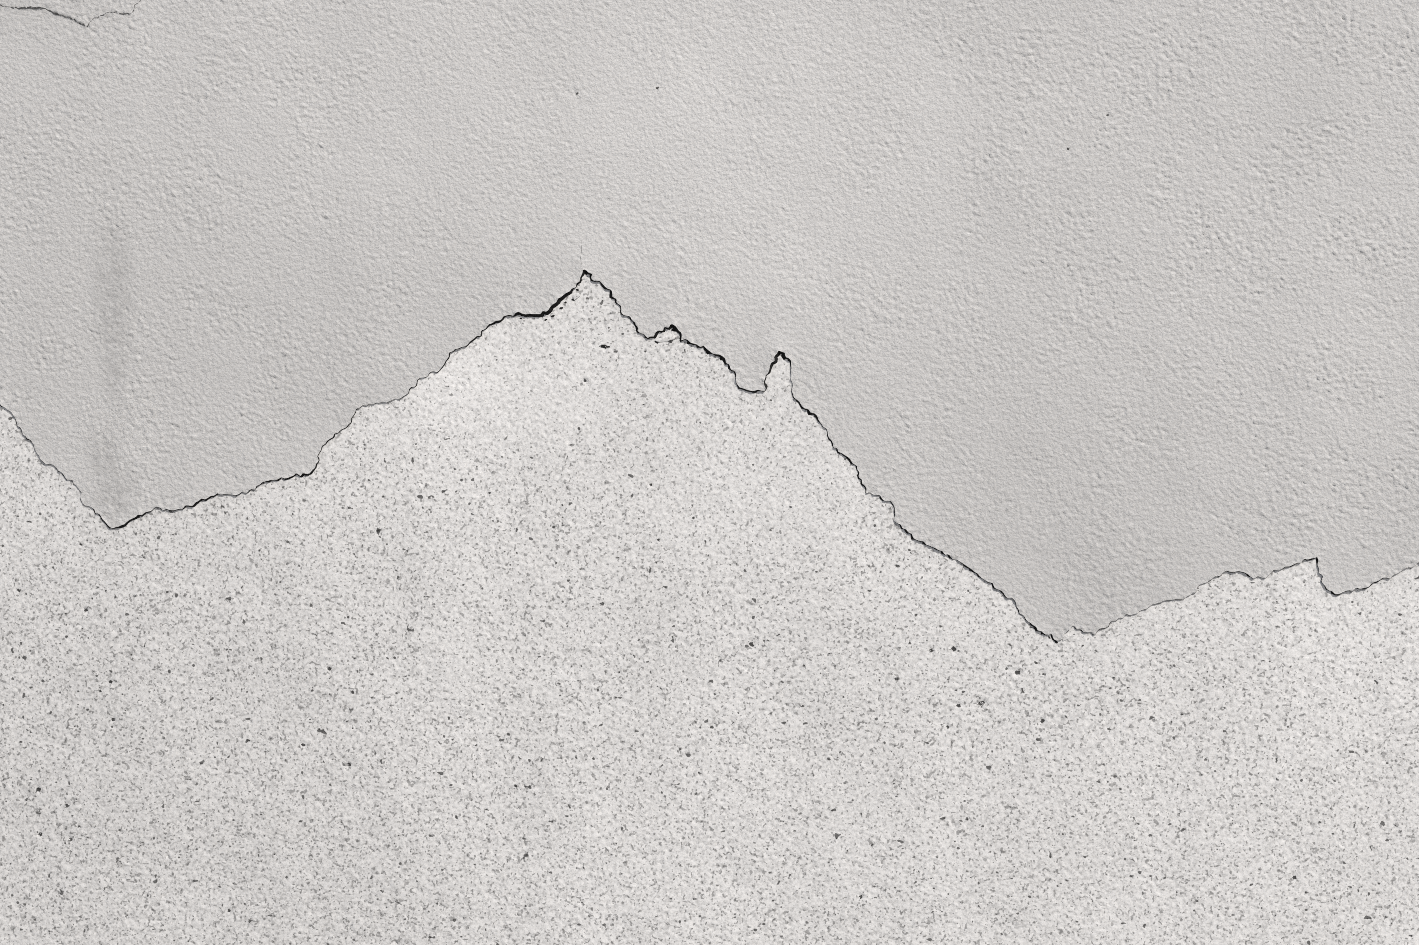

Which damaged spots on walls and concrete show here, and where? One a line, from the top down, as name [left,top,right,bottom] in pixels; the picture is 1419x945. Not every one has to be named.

crack [0,0,141,27]
peeling [0,270,1419,945]